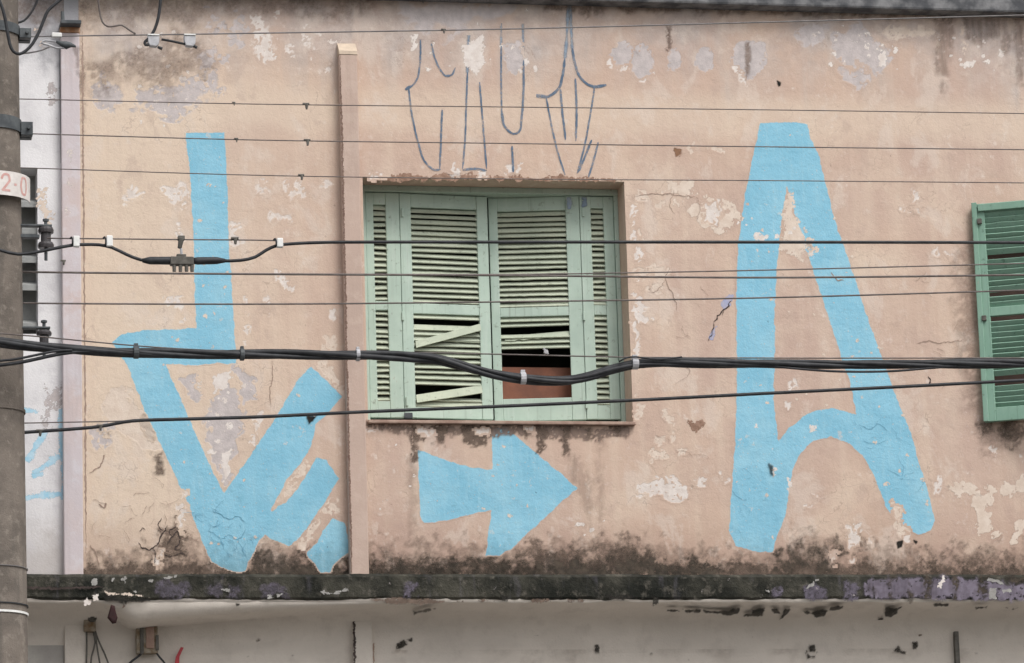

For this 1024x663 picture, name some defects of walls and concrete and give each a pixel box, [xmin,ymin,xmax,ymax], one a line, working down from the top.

peeling [88,3,340,129]
peeling [604,37,769,90]
peeling [791,14,1005,93]
crack [639,191,701,215]
crack [27,31,256,590]
crack [653,268,731,340]
peeling [626,179,825,356]
peeling [173,361,267,488]
water stain [366,421,629,462]
peeling [632,391,738,506]
water stain [369,536,1024,603]
peeling [803,574,1024,620]